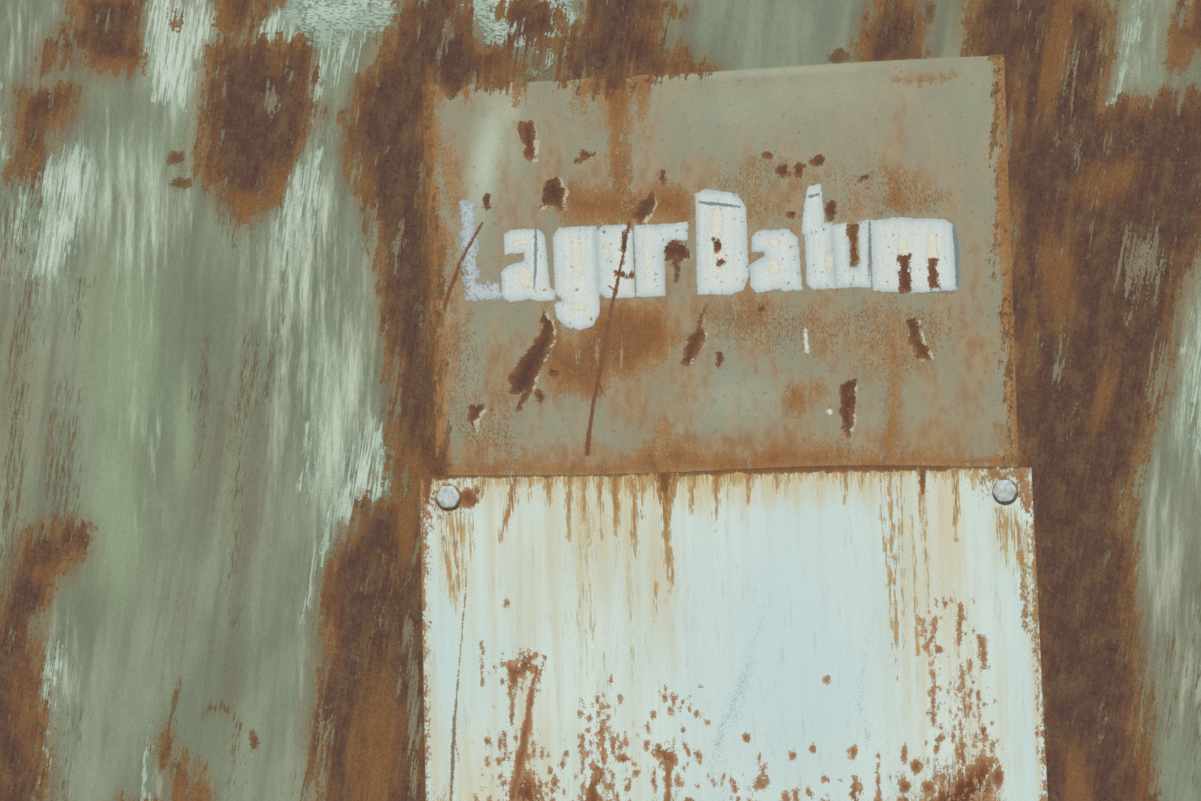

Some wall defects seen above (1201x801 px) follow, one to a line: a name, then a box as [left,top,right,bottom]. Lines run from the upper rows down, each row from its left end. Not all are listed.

corrosion [166,0,328,247]
corrosion [0,0,148,801]
corrosion [292,0,1201,801]
corrosion [119,678,212,801]
corrosion [202,701,259,791]